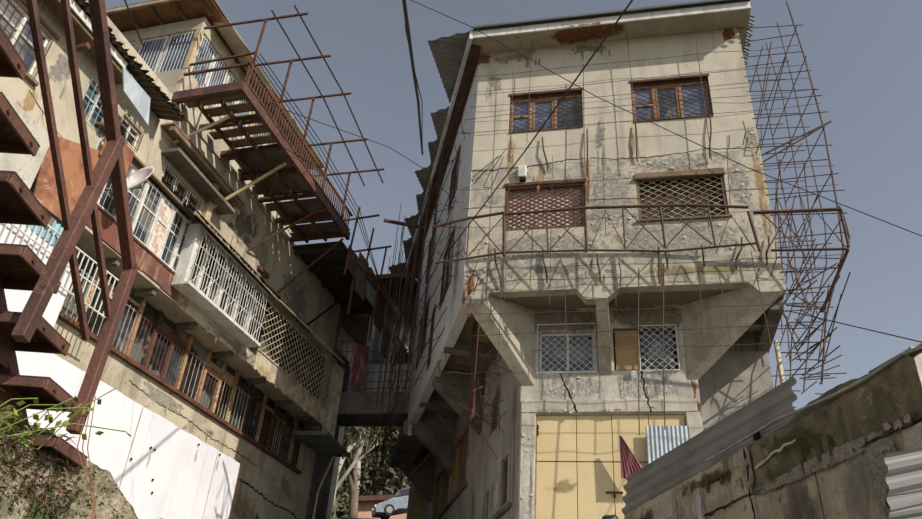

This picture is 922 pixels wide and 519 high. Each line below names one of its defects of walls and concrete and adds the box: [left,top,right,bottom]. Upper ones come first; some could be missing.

rust [86,209,121,255]
rust [134,240,189,312]
crack [560,373,578,412]
crack [641,371,654,412]
crack [129,380,297,519]